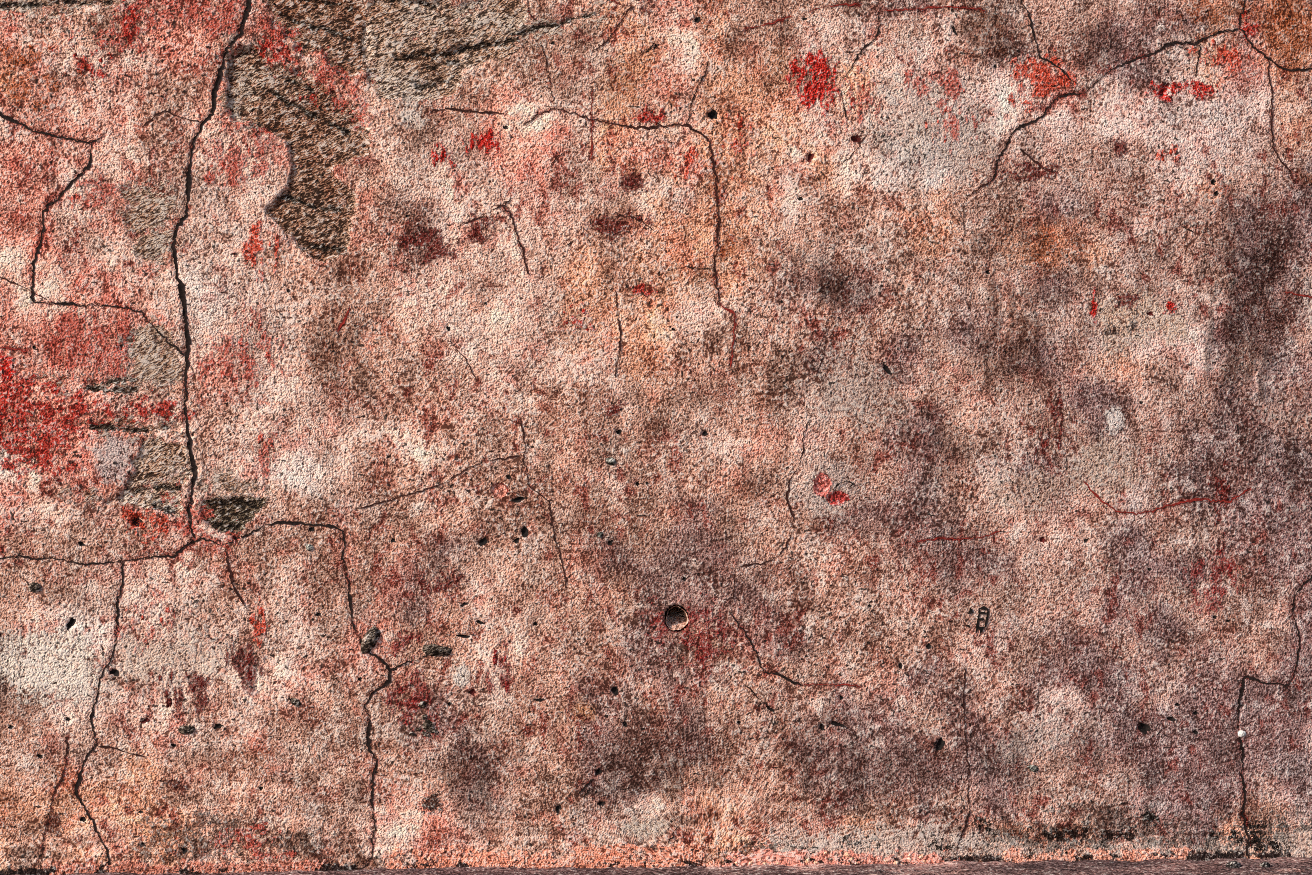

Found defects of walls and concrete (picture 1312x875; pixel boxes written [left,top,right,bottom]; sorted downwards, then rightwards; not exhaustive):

crack [431,0,737,377]
crack [962,0,1312,235]
crack [0,0,567,872]
crack [1237,575,1312,859]